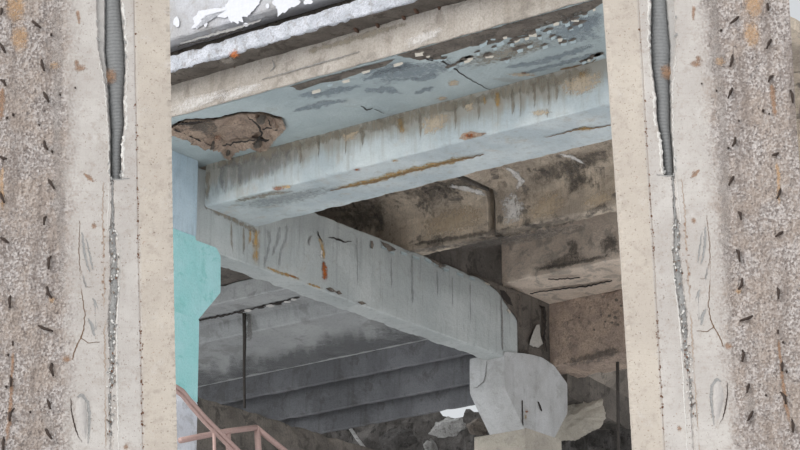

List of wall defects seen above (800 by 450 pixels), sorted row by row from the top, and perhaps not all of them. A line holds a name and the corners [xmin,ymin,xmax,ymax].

peeling [178,0,313,47]
damp [218,14,598,168]
peeling [290,0,604,95]
crack [421,56,490,90]
spalling [171,112,286,161]
damp [538,152,606,190]
crack [72,12,145,450]
rust [309,239,327,288]
damp [410,168,612,252]
damp [540,237,616,270]
crack [638,0,723,450]
crack [530,277,612,352]